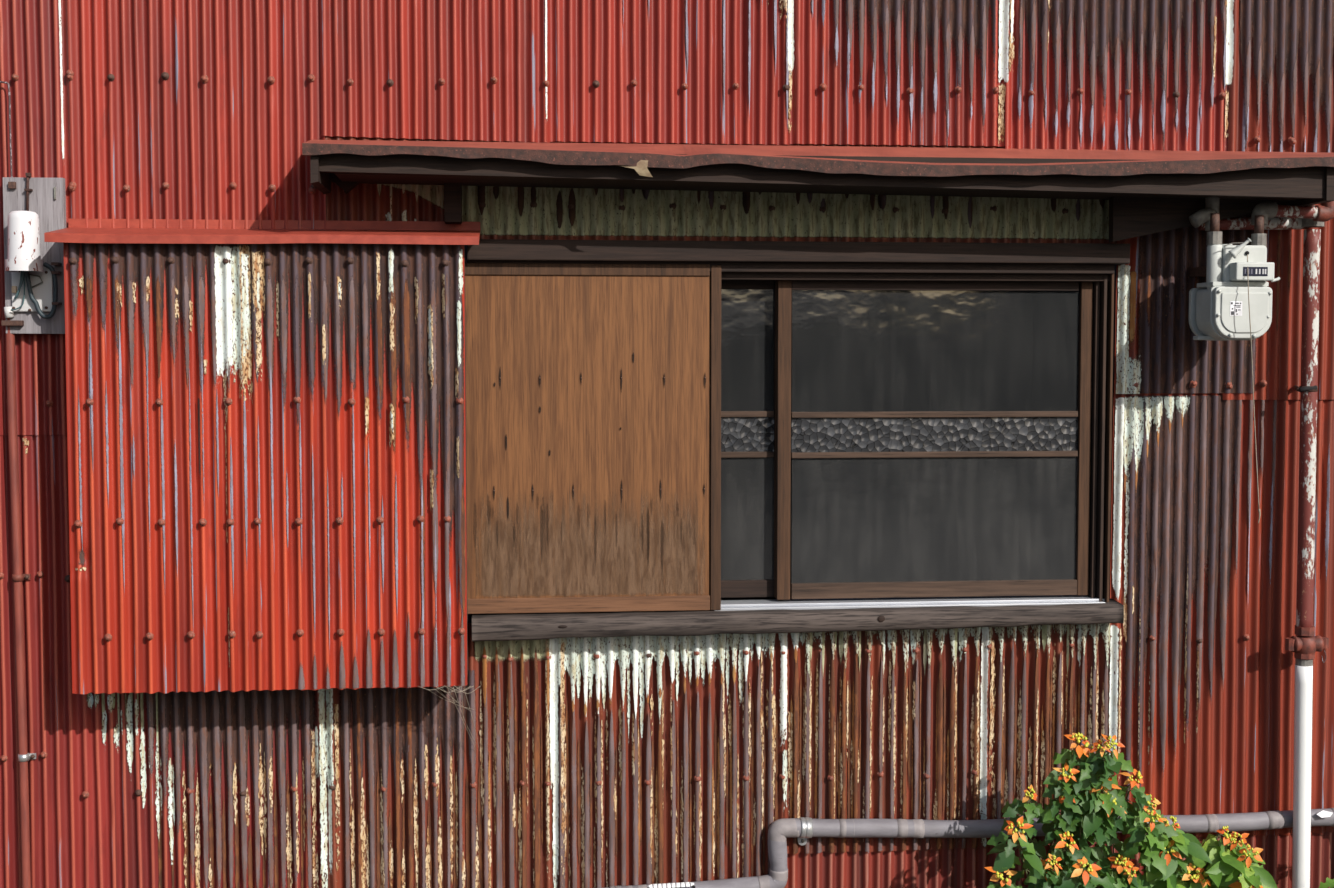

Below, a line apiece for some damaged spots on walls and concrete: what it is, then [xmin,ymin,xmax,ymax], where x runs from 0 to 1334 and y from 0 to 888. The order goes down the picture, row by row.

peeling [204,245,280,543]
corrosion [68,243,543,888]
peeling [308,271,326,365]
peeling [376,249,395,351]
peeling [414,249,463,398]
peeling [1052,264,1190,755]
corrosion [997,214,1277,819]
corrosion [1267,230,1291,331]
peeling [194,784,213,888]
peeling [233,633,865,888]
corrosion [559,651,981,888]
peeling [923,627,1045,820]